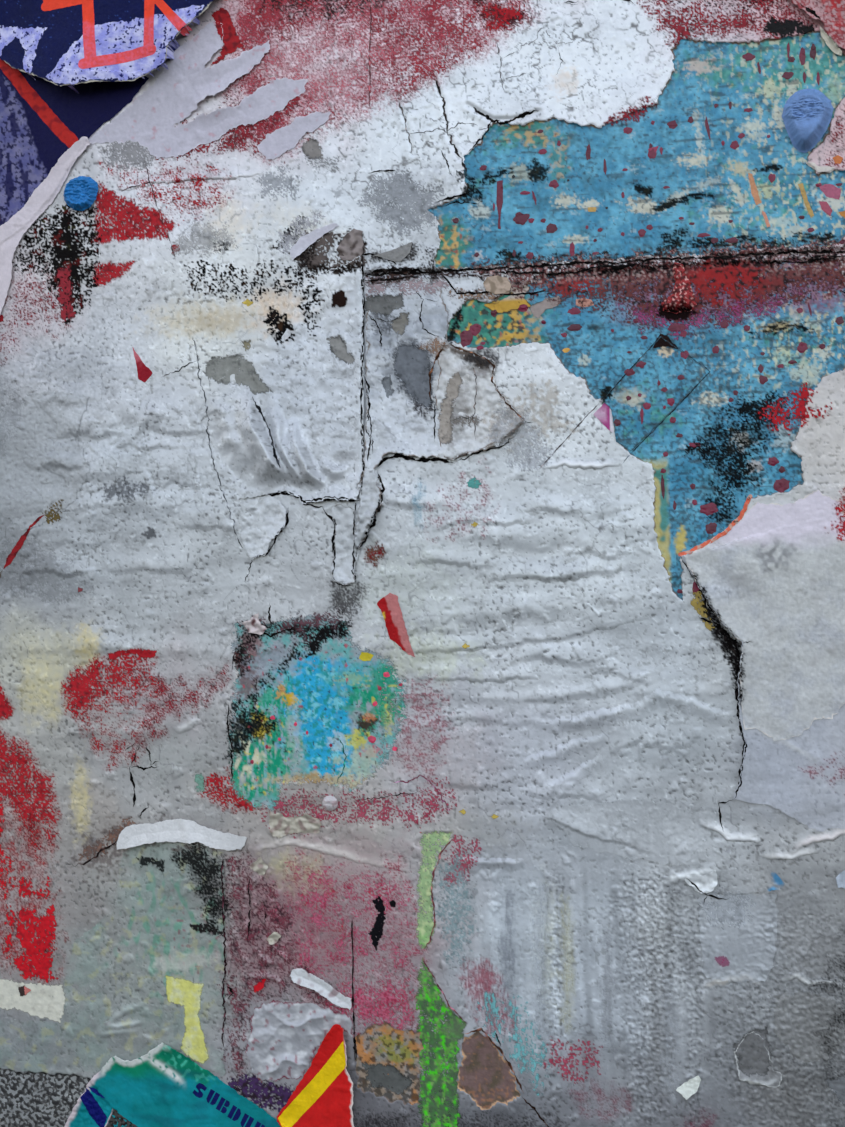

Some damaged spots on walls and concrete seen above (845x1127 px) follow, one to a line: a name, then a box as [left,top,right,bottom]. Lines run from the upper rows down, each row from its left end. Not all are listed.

peeling [302,138,323,160]
crack [164,243,845,586]
peeling [428,31,845,601]
crack [681,558,750,828]
peeling [712,816,845,860]
peeling [836,870,845,889]